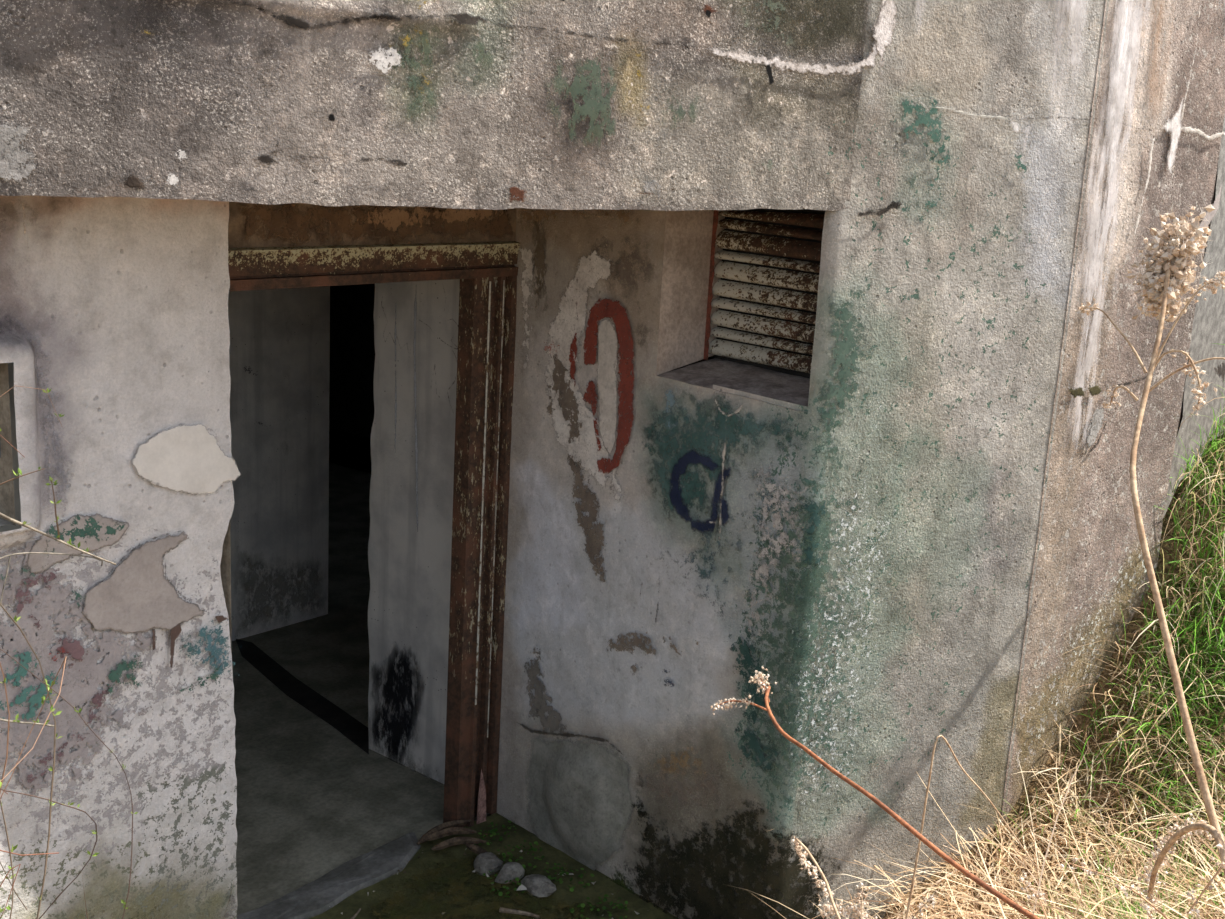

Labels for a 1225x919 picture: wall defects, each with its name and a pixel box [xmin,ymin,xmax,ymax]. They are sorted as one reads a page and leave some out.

water stain [767,0,863,47]
crack [229,0,1088,120]
spalling [0,117,36,185]
crack [258,144,314,164]
crack [360,158,407,167]
crack [1126,5,1225,236]
rust [241,203,513,247]
crack [858,201,901,216]
peeling [545,250,623,582]
peeling [132,424,240,494]
peeling [0,514,239,801]
water stain [625,802,841,919]